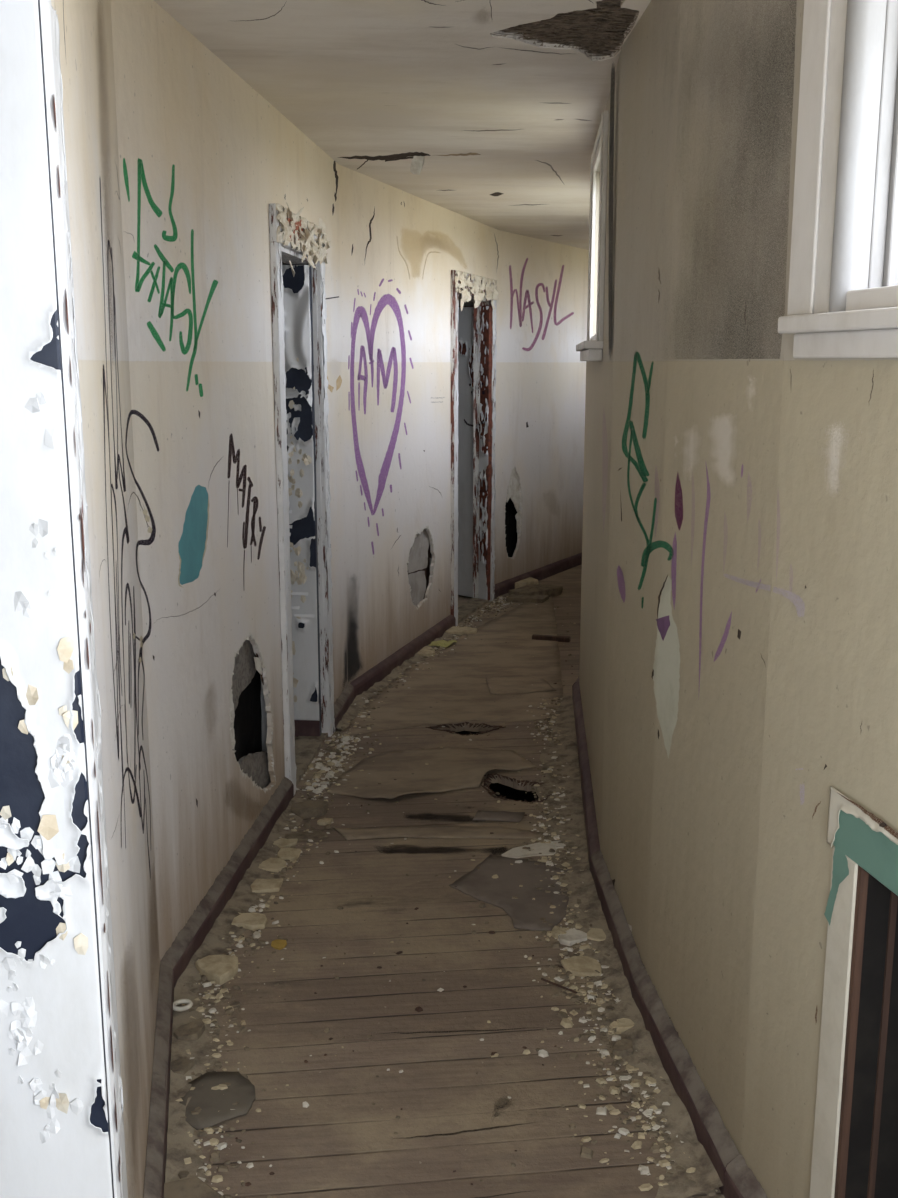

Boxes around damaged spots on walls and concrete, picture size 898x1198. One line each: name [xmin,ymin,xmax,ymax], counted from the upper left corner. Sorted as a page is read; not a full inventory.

crack [421,0,570,65]
crack [352,202,405,258]
crack [284,129,520,214]
crack [490,192,543,206]
peeling [454,270,523,626]
peeling [276,202,342,795]
peeling [0,0,128,1198]
spalling [407,526,435,610]
spalling [229,632,276,793]
peeling [827,786,898,847]